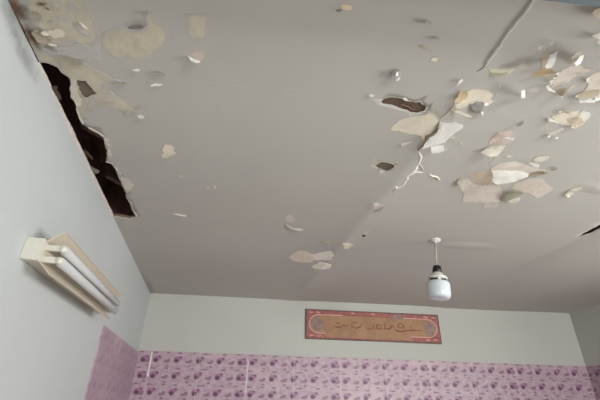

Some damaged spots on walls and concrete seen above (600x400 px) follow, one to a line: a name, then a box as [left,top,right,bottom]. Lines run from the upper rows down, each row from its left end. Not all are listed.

peeling [521,42,600,103]
peeling [25,0,169,220]
crack [392,108,452,193]
peeling [390,106,463,154]
peeling [457,121,557,210]
peeling [548,109,591,139]
peeling [288,241,334,270]